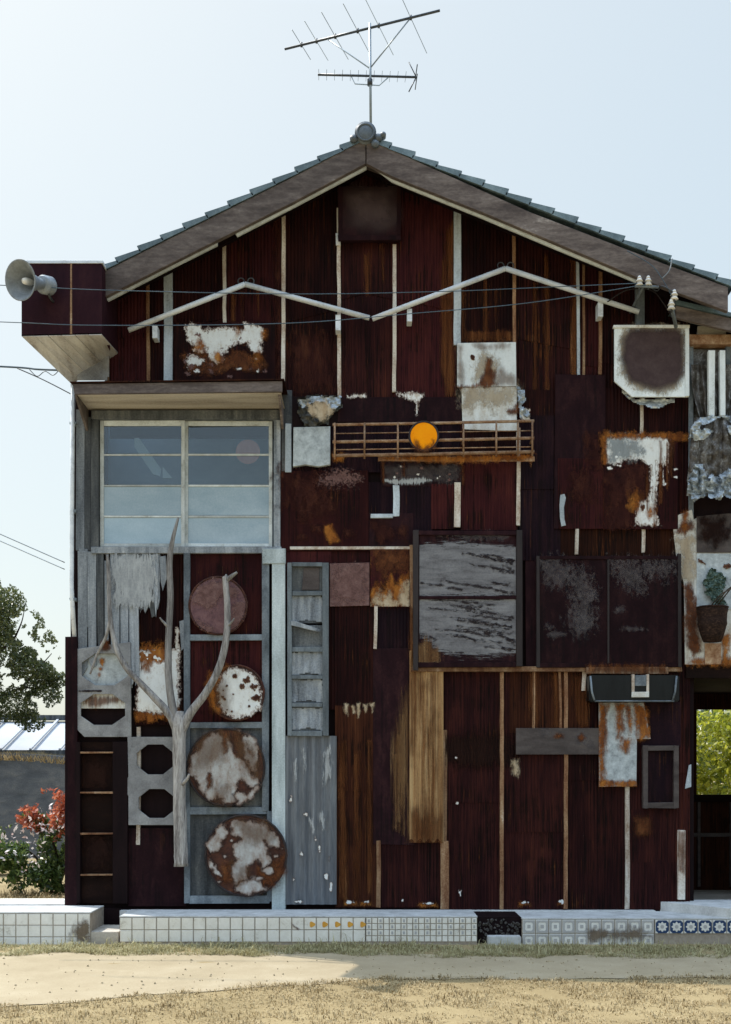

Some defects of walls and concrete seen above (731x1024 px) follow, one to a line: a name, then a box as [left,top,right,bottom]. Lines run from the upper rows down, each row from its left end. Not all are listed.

corrosion [182,219,346,421]
corrosion [440,221,511,397]
corrosion [297,513,352,544]
corrosion [600,431,688,531]
peeling [419,538,516,658]
corrosion [139,642,165,672]
corrosion [135,709,179,723]
corrosion [205,665,261,713]
corrosion [370,521,519,843]
corrosion [572,664,668,787]
corrosion [222,861,234,883]
corrosion [256,855,286,887]